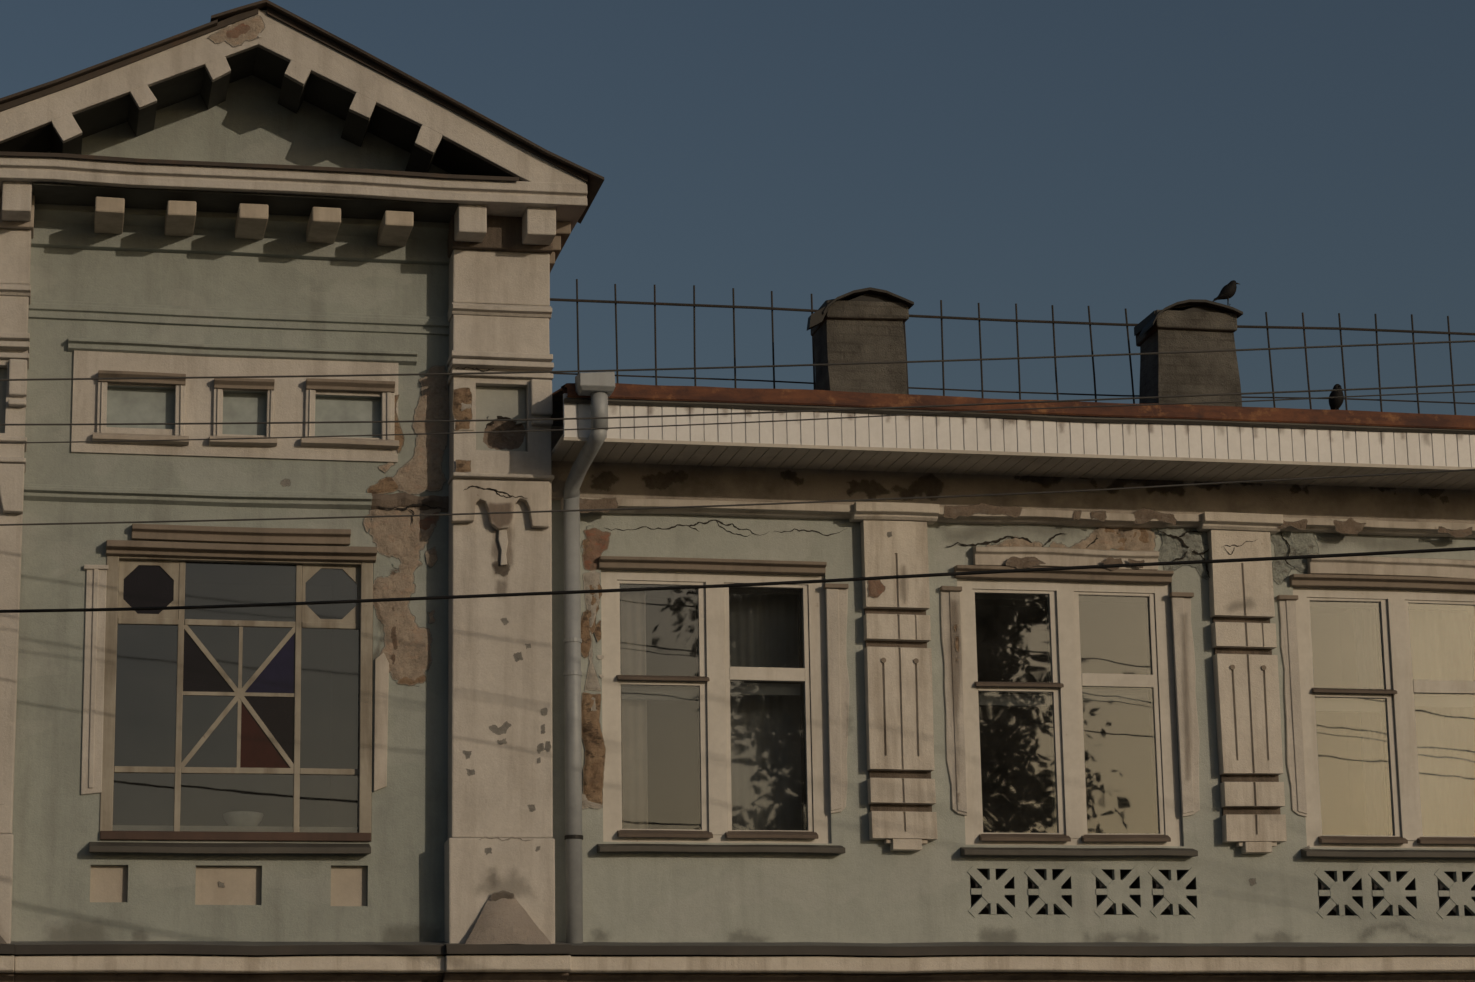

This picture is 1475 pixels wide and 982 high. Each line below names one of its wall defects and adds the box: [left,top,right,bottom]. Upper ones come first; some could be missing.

peeling [363,365,526,687]
crack [378,485,524,524]
crack [606,520,845,537]
peeling [847,474,1263,570]
crack [1159,530,1295,578]
spalling [579,471,619,809]
peeling [489,722,511,745]
peeling [537,708,551,763]